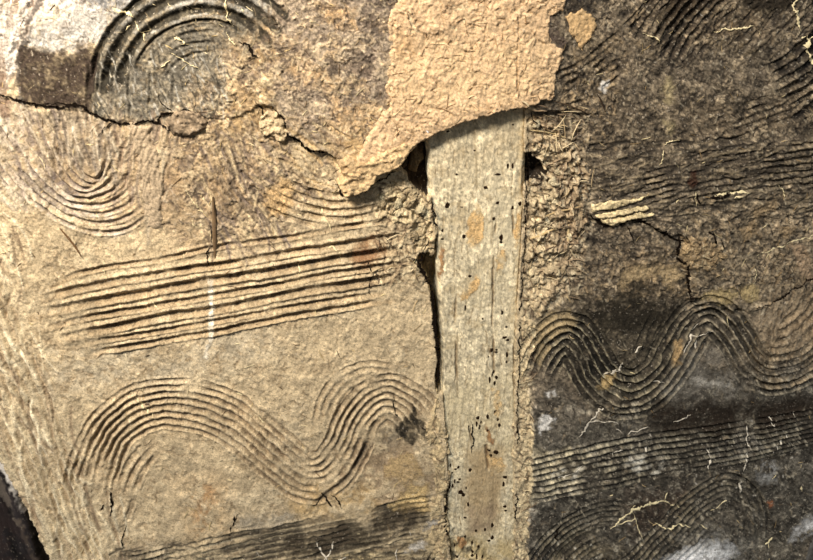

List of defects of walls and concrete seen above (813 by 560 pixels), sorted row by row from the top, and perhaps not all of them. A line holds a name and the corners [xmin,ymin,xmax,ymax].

crack [0,93,207,136]
crack [259,106,333,157]
crack [590,212,707,300]
crack [754,235,813,283]
crack [413,204,441,392]
crack [756,278,813,309]
spalling [390,388,451,560]